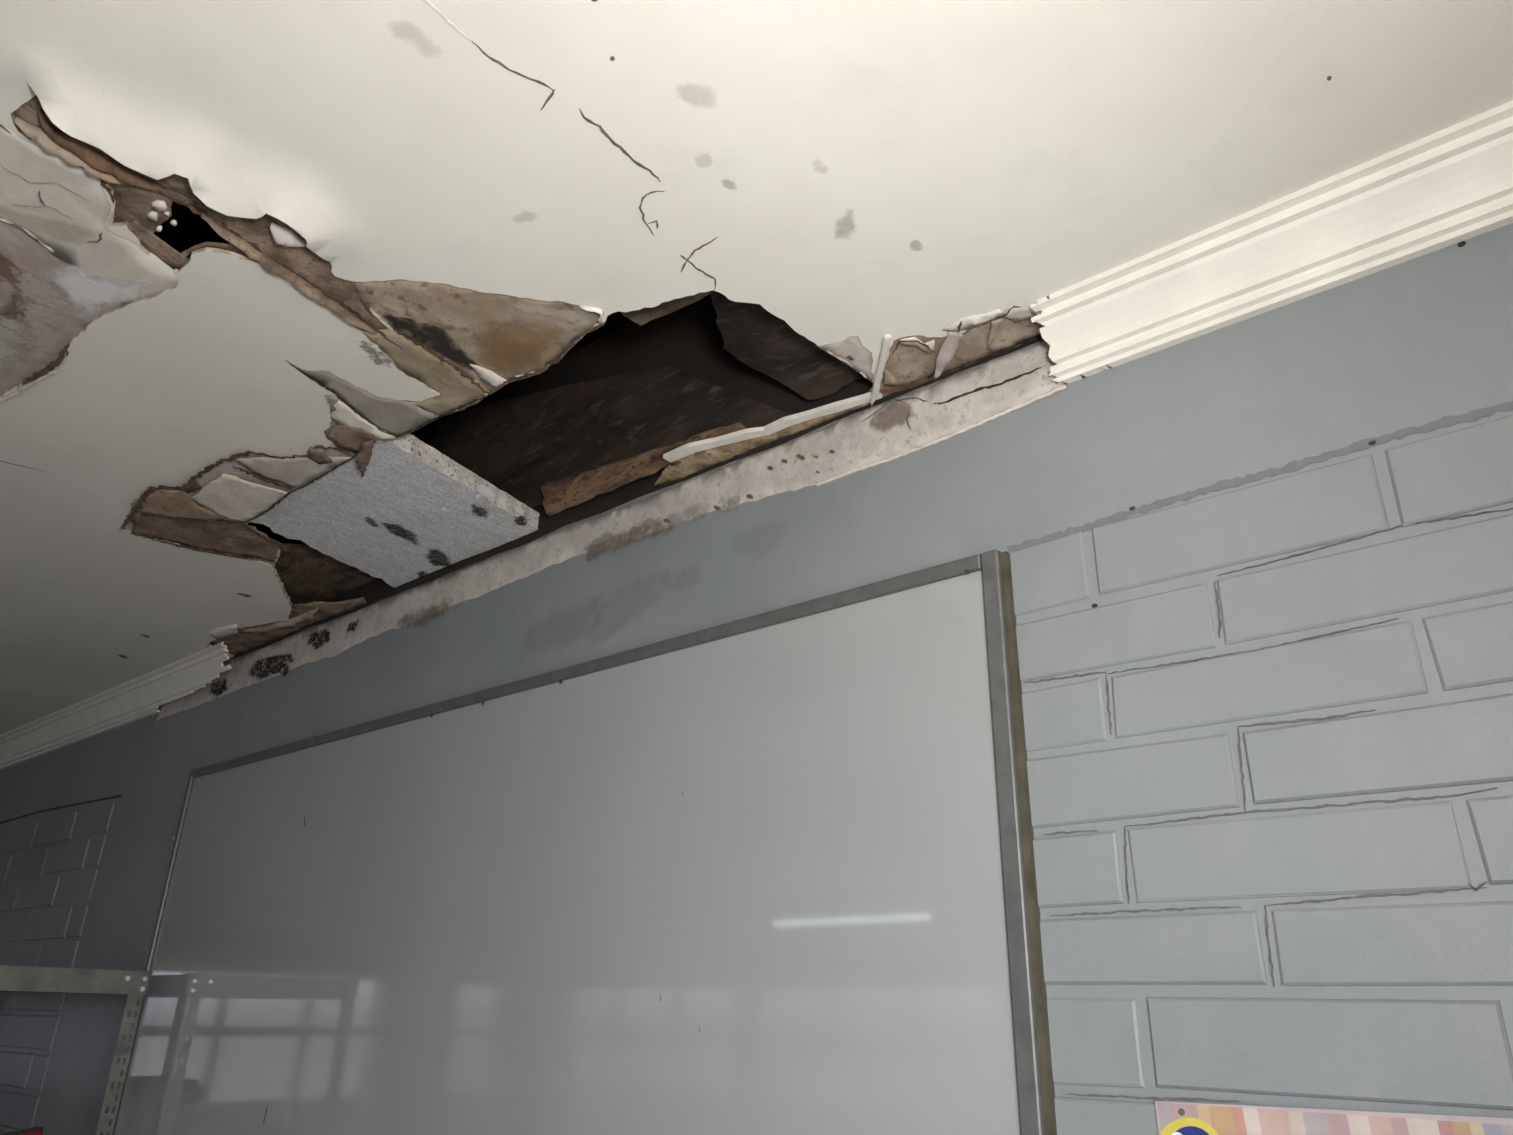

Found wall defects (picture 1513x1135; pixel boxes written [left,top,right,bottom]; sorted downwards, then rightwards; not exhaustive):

peeling [0,125,180,403]
crack [423,0,718,290]
flaking render [154,336,1067,721]